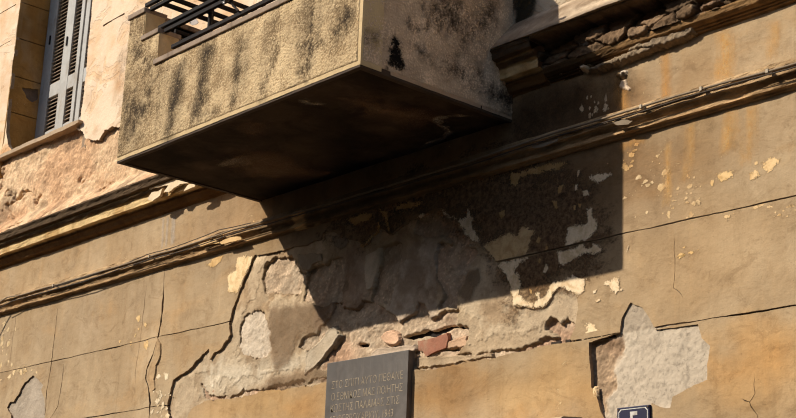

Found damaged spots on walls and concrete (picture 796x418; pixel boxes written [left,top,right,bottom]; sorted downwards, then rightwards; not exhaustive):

leakage [124,88,151,141]
leakage [165,63,185,134]
leakage [192,47,211,121]
leakage [387,35,405,71]
peeling [579,95,633,130]
spalling [0,127,198,233]
peeling [635,154,733,219]
peeling [749,157,781,181]
spalling [150,161,710,418]
spalling [0,321,45,418]